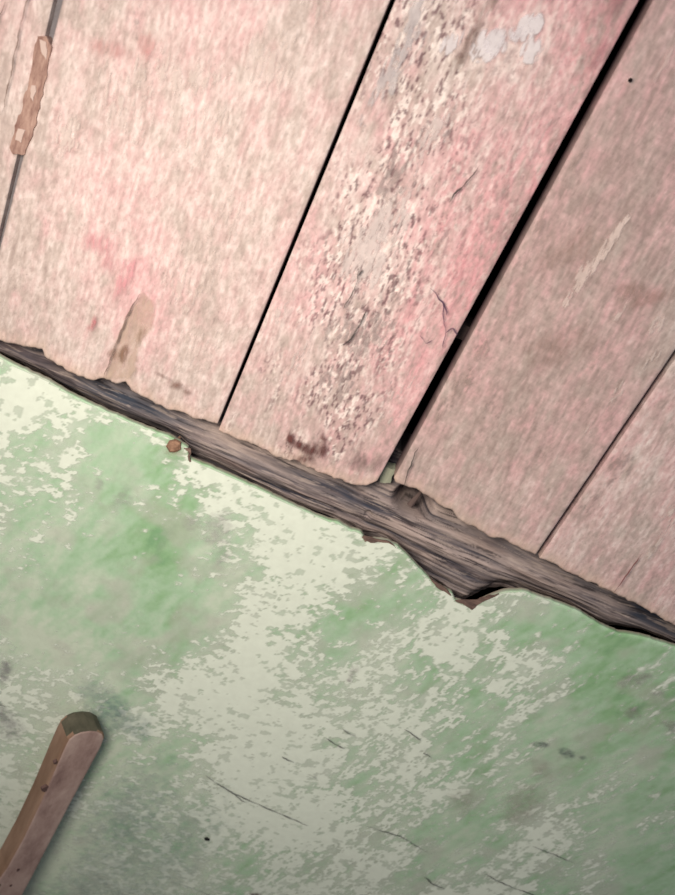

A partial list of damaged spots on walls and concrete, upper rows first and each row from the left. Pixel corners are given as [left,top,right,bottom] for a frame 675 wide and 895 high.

peeling [470,13,544,64]
peeling [563,215,631,307]
peeling [0,359,128,577]
peeling [133,428,169,446]
peeling [0,447,645,895]
peeling [627,645,675,740]
crack [208,777,308,826]